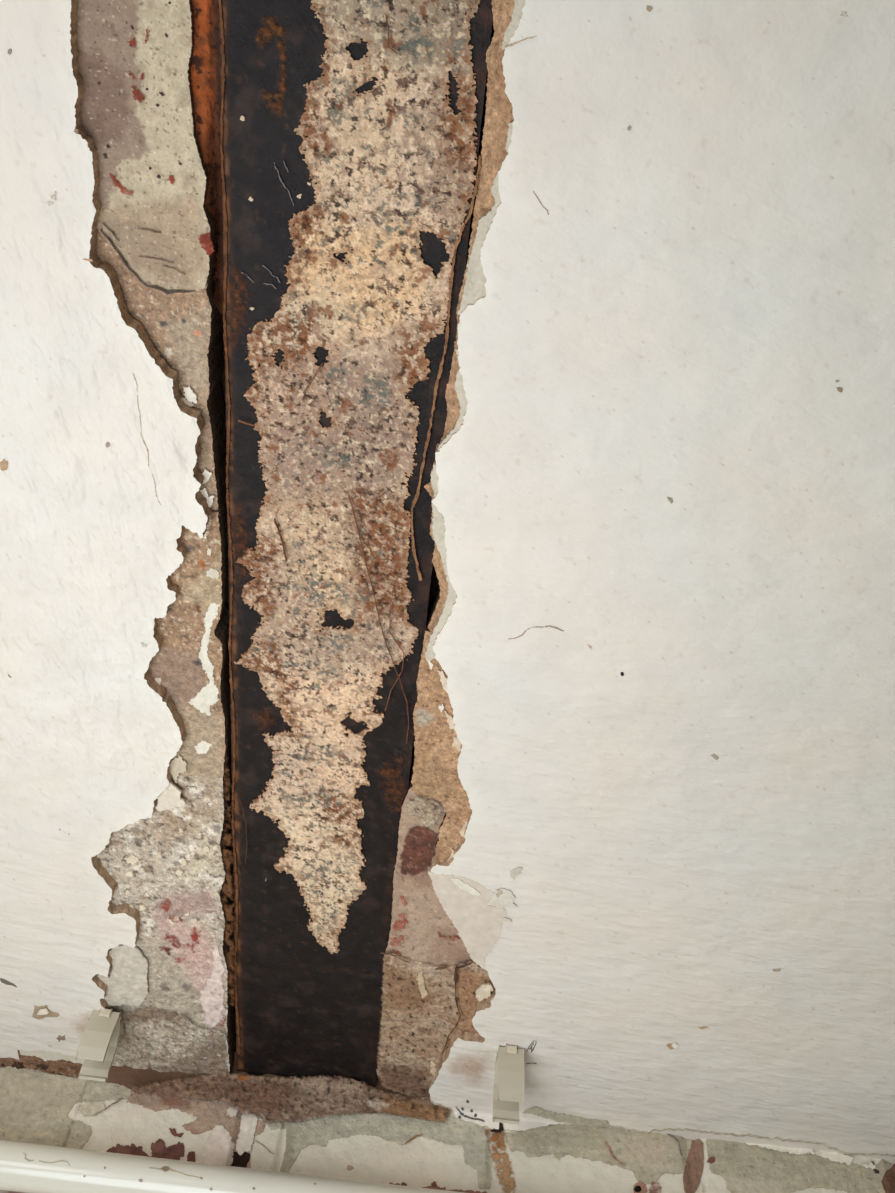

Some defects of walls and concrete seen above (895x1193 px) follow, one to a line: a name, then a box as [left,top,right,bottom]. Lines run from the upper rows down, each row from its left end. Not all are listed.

corrosion [256,20,286,109]
crack [83,223,195,294]
corrosion [410,155,481,581]
crack [133,373,161,505]
corrosion [190,0,247,1055]
flaking render [0,0,526,1193]
peeling [504,1106,895,1193]